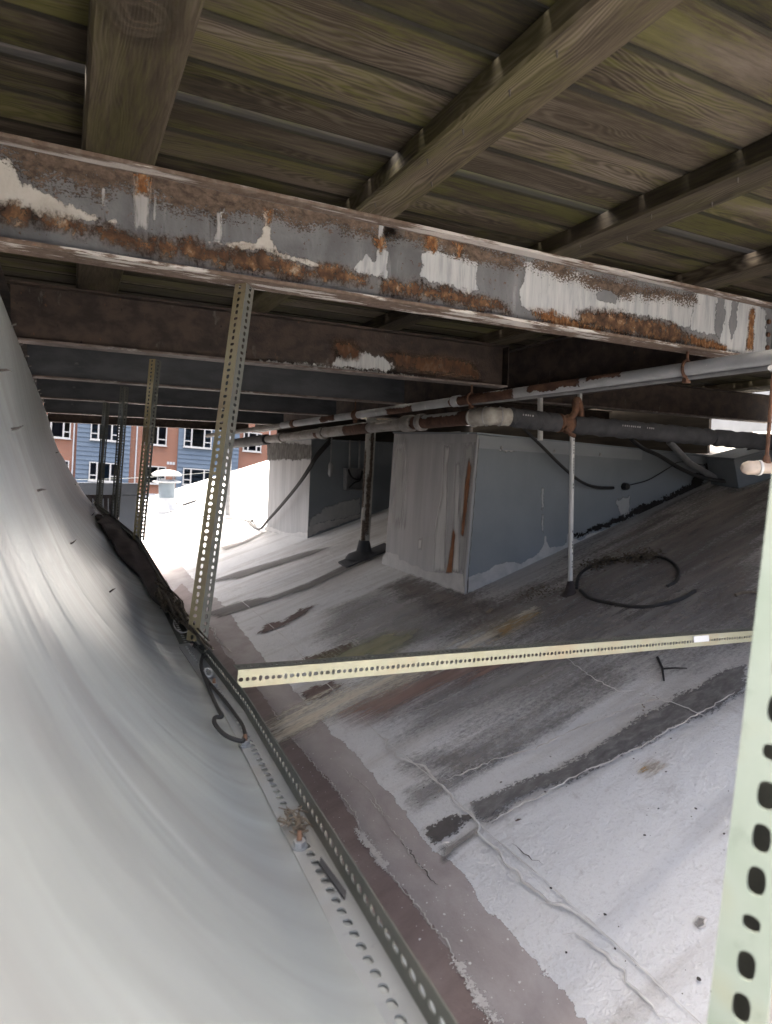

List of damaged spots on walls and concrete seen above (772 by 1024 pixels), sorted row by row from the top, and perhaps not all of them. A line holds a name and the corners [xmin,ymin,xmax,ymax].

peeling [0,158,118,223]
rust [0,144,510,315]
rust [148,176,727,351]
peeling [420,250,479,295]
peeling [260,351,418,377]
rust [332,340,361,361]
rust [385,351,481,381]
rust [527,371,625,393]
peeling [519,261,767,354]
rust [745,308,756,350]
rust [446,461,471,573]
peeling [141,522,608,1024]